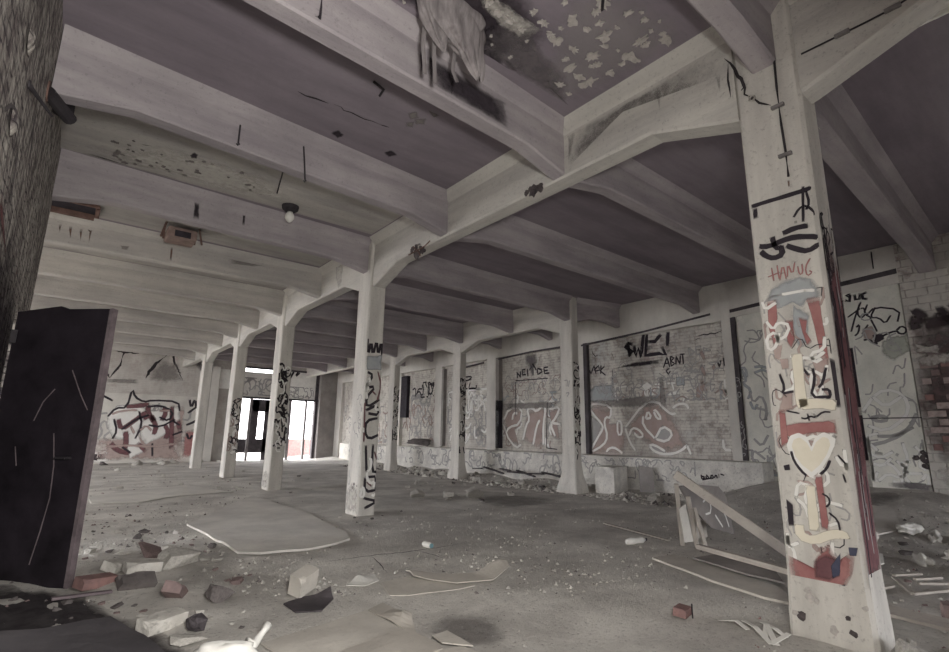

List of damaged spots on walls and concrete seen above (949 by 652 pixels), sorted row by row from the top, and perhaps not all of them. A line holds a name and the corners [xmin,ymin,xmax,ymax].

damp [493,32,561,98]
peeling [484,0,672,96]
crack [724,58,769,105]
flaking render [912,320,949,470]